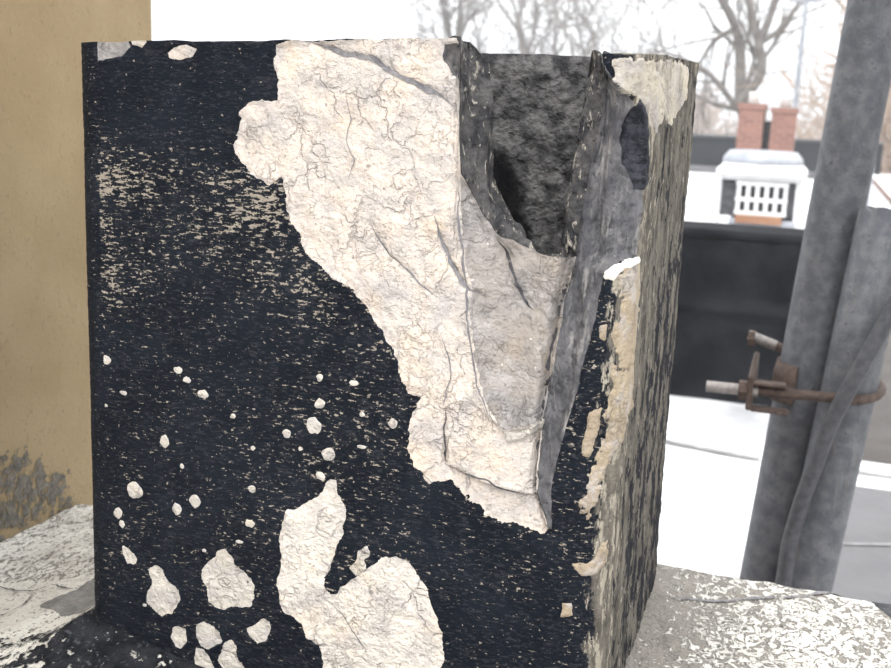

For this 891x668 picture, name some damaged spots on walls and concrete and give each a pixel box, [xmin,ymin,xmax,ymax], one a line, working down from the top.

peeling [97,41,146,61]
peeling [168,45,197,60]
spalling [234,38,577,534]
peeling [578,254,640,520]
peeling [127,482,143,498]
peeling [172,495,201,515]
peeling [143,565,180,616]
peeling [201,549,255,610]
peeling [276,472,444,668]
crack [659,591,846,602]
peeling [171,622,244,668]
peeling [247,618,271,643]